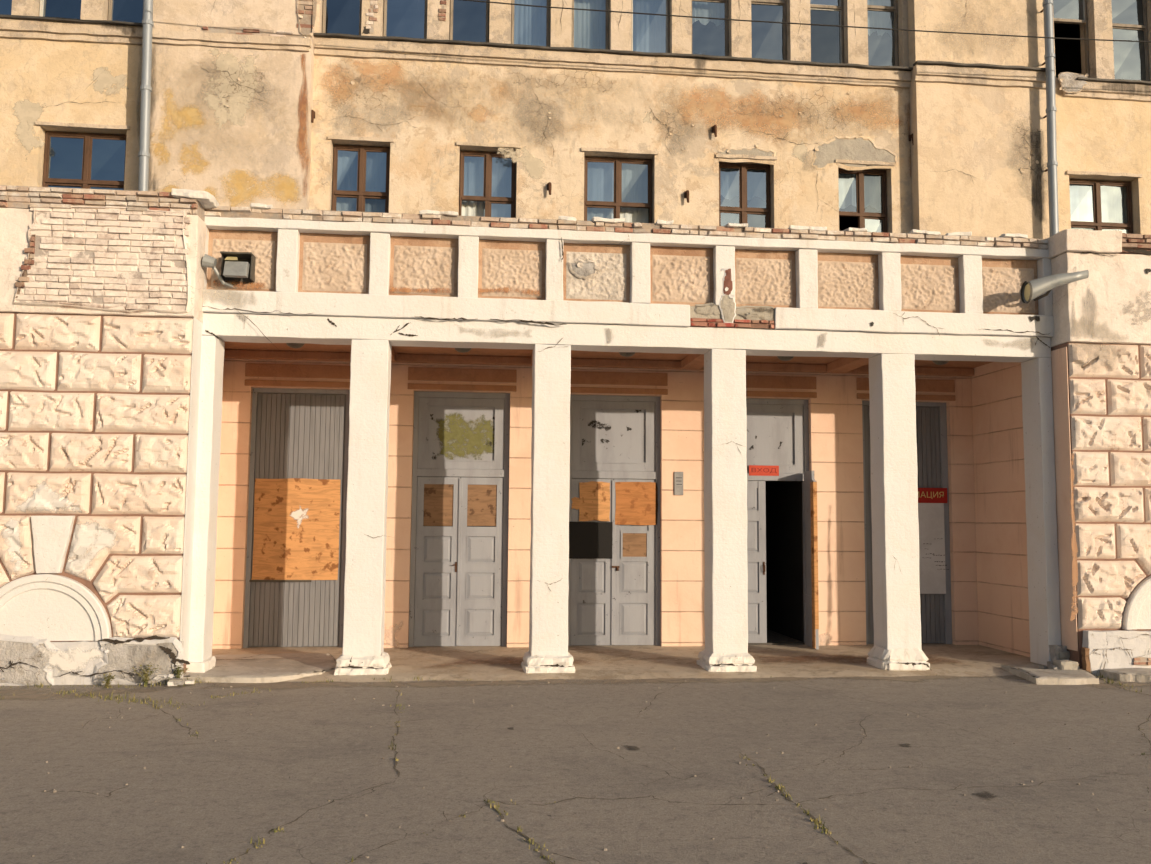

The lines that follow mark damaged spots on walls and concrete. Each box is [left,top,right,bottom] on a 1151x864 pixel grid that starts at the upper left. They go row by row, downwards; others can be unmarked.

flaking render [203,0,317,38]
flaking render [366,0,378,34]
flaking render [438,0,446,21]
peeling [204,50,265,130]
flaking render [735,89,898,170]
flaking render [715,144,776,165]
leakage [1033,133,1044,220]
flaking render [13,206,191,314]
flaking render [690,268,775,329]
peeling [582,420,611,445]
crack [0,635,288,680]
crack [329,657,384,670]